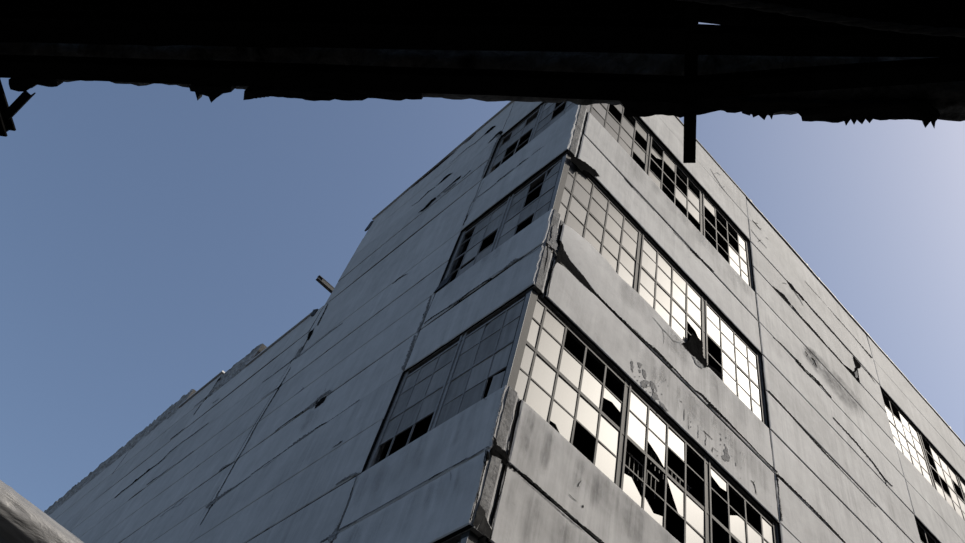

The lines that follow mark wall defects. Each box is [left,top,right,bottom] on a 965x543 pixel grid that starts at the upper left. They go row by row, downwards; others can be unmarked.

spalling [843,356,875,383]
spalling [277,390,331,430]